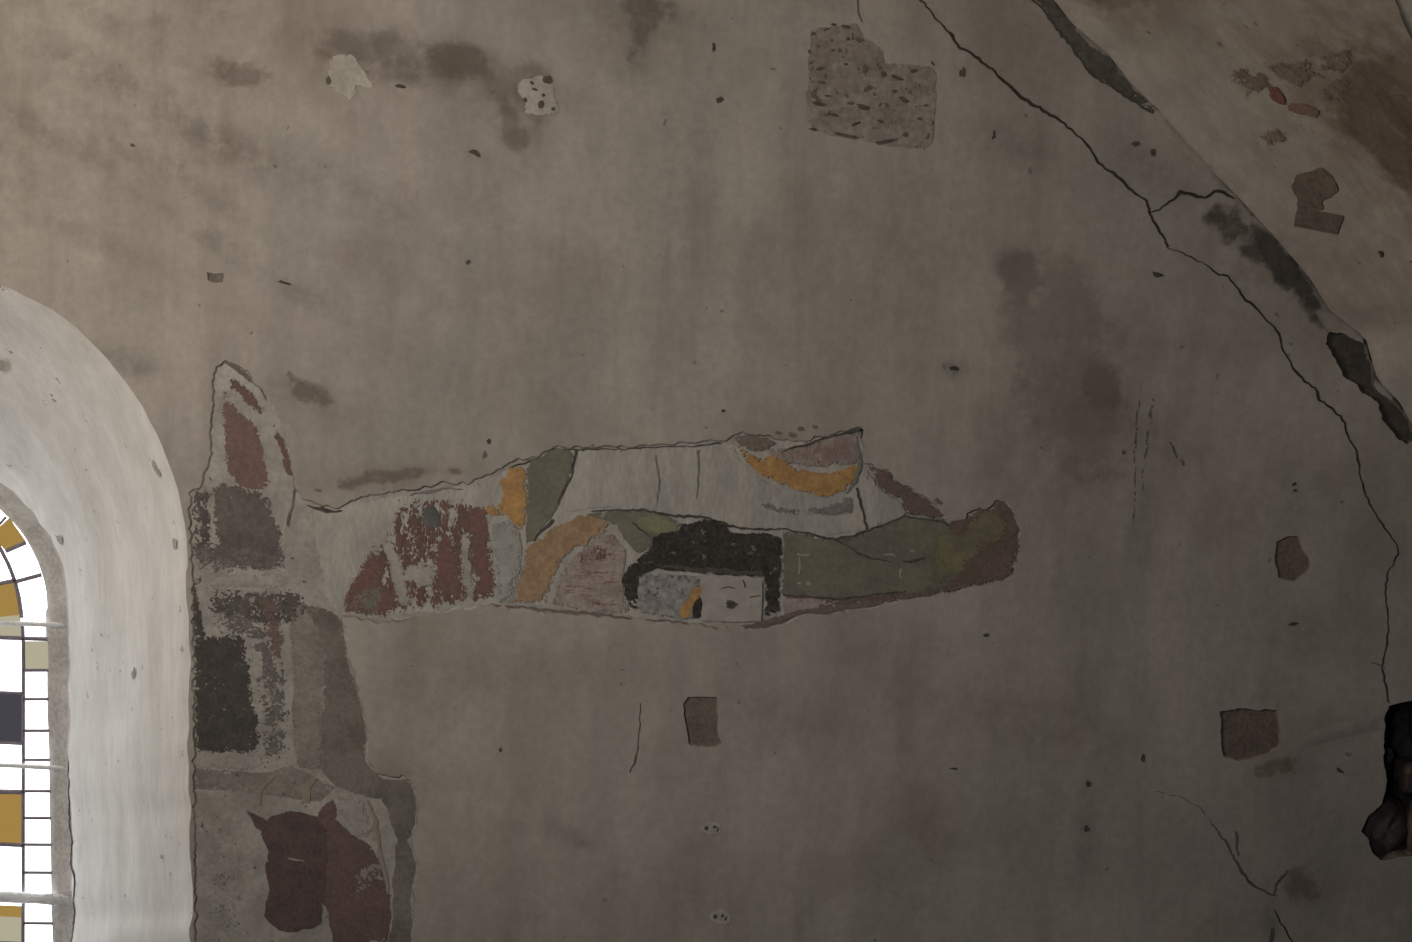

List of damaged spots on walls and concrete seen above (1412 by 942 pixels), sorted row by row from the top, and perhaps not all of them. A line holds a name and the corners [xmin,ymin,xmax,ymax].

spalling [1031,0,1158,114]
spalling [1291,167,1344,235]
damp [1255,227,1320,308]
crack [919,0,1399,703]
spalling [1326,332,1412,444]
spalling [1275,536,1310,582]
peeling [172,360,1021,942]
spalling [1220,708,1281,761]
spalling [1361,701,1412,860]
crack [1156,791,1293,942]